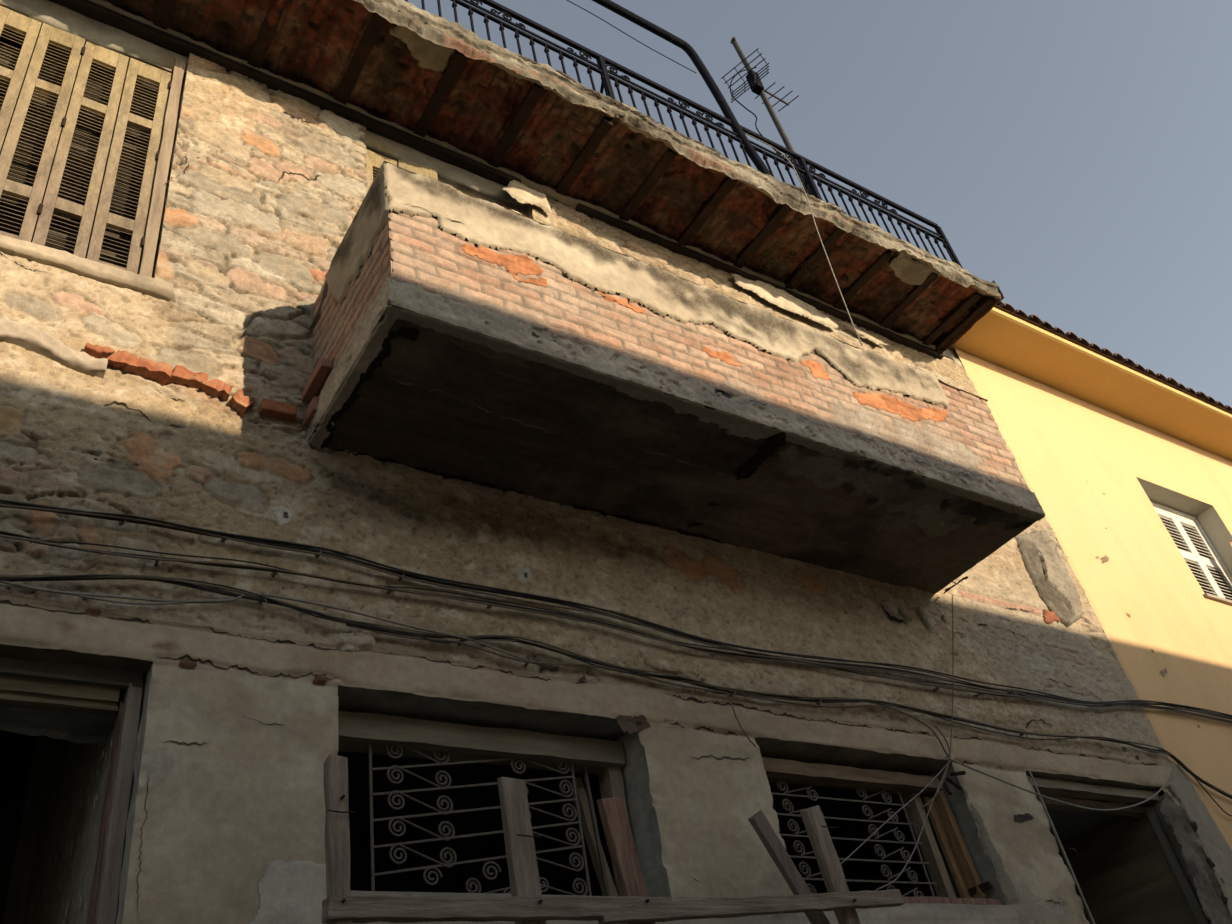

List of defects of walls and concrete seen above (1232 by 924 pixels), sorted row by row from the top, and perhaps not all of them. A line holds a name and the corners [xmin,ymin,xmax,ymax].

peeling [389,10,455,71]
damp [399,169,521,220]
peeling [503,180,552,223]
spalling [460,244,547,287]
damp [559,230,612,260]
damp [627,261,793,336]
peeling [730,273,888,345]
damp [823,337,885,379]
crack [0,600,592,684]
crack [671,693,1158,772]
crack [136,740,214,916]
peeling [250,860,327,924]